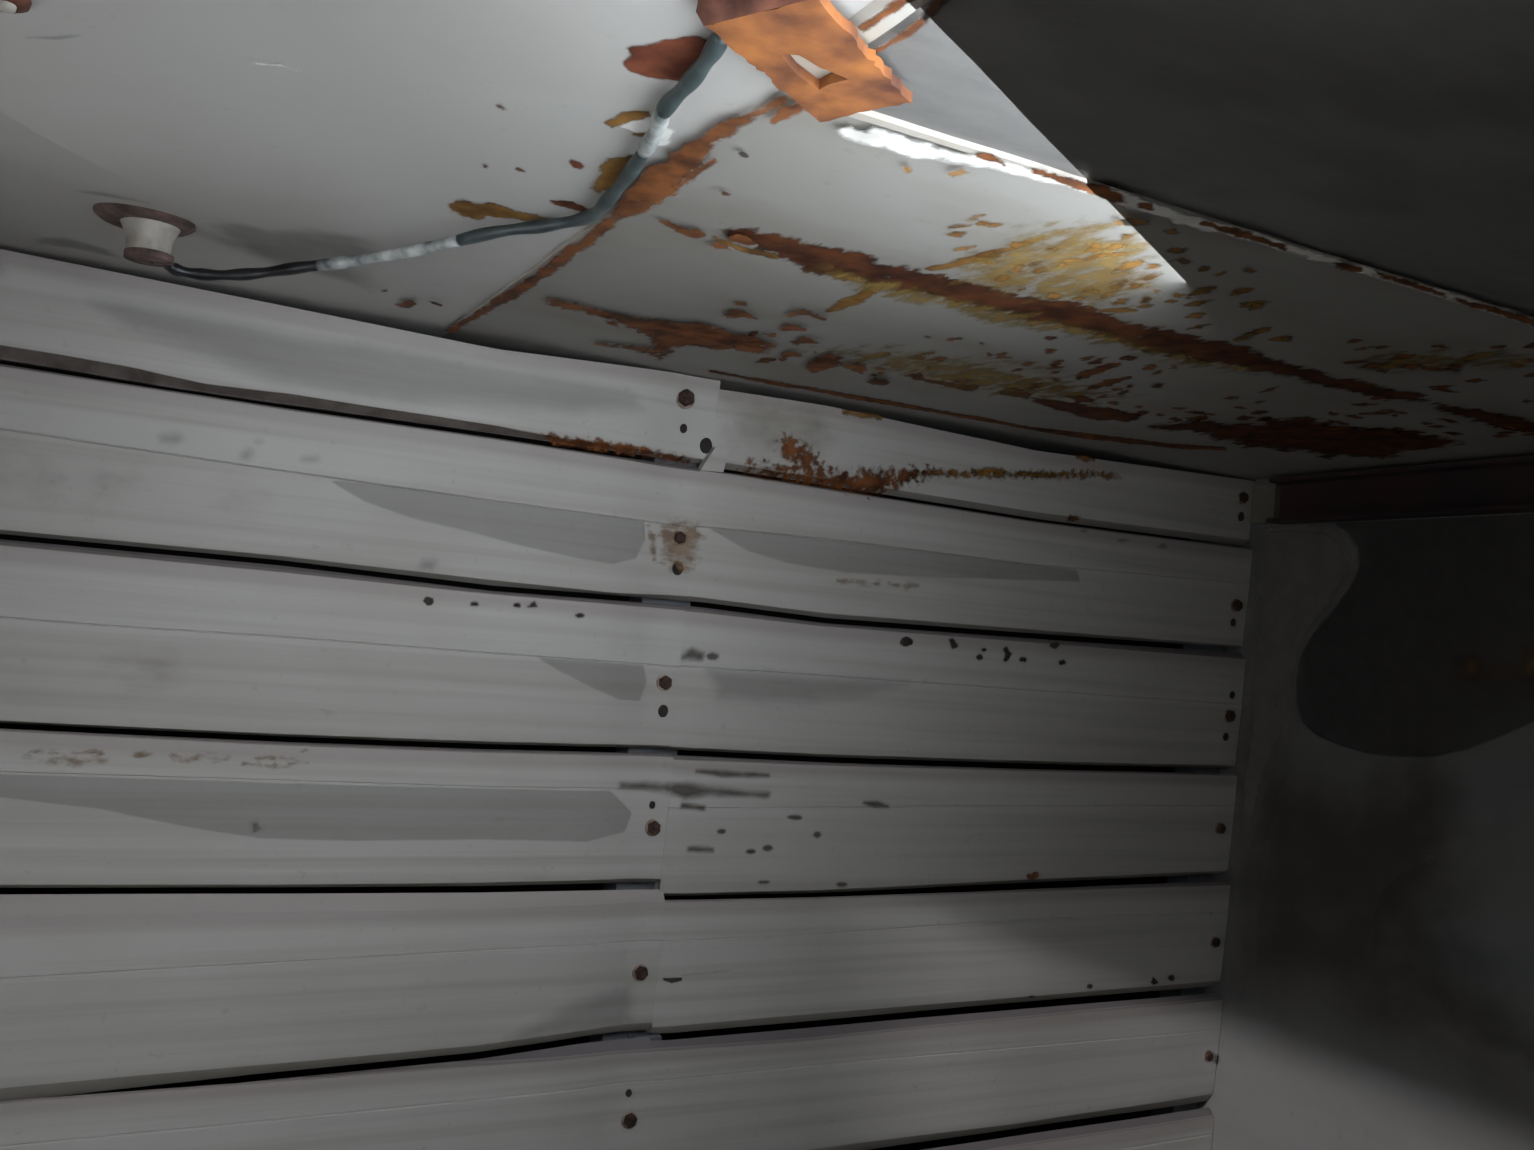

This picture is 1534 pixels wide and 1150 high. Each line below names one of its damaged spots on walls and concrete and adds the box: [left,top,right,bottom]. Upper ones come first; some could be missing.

peeling [839,128,1089,192]
rust [382,290,442,308]
rust [446,96,1534,499]
peeling [1110,189,1534,324]
water stain [1295,513,1534,757]